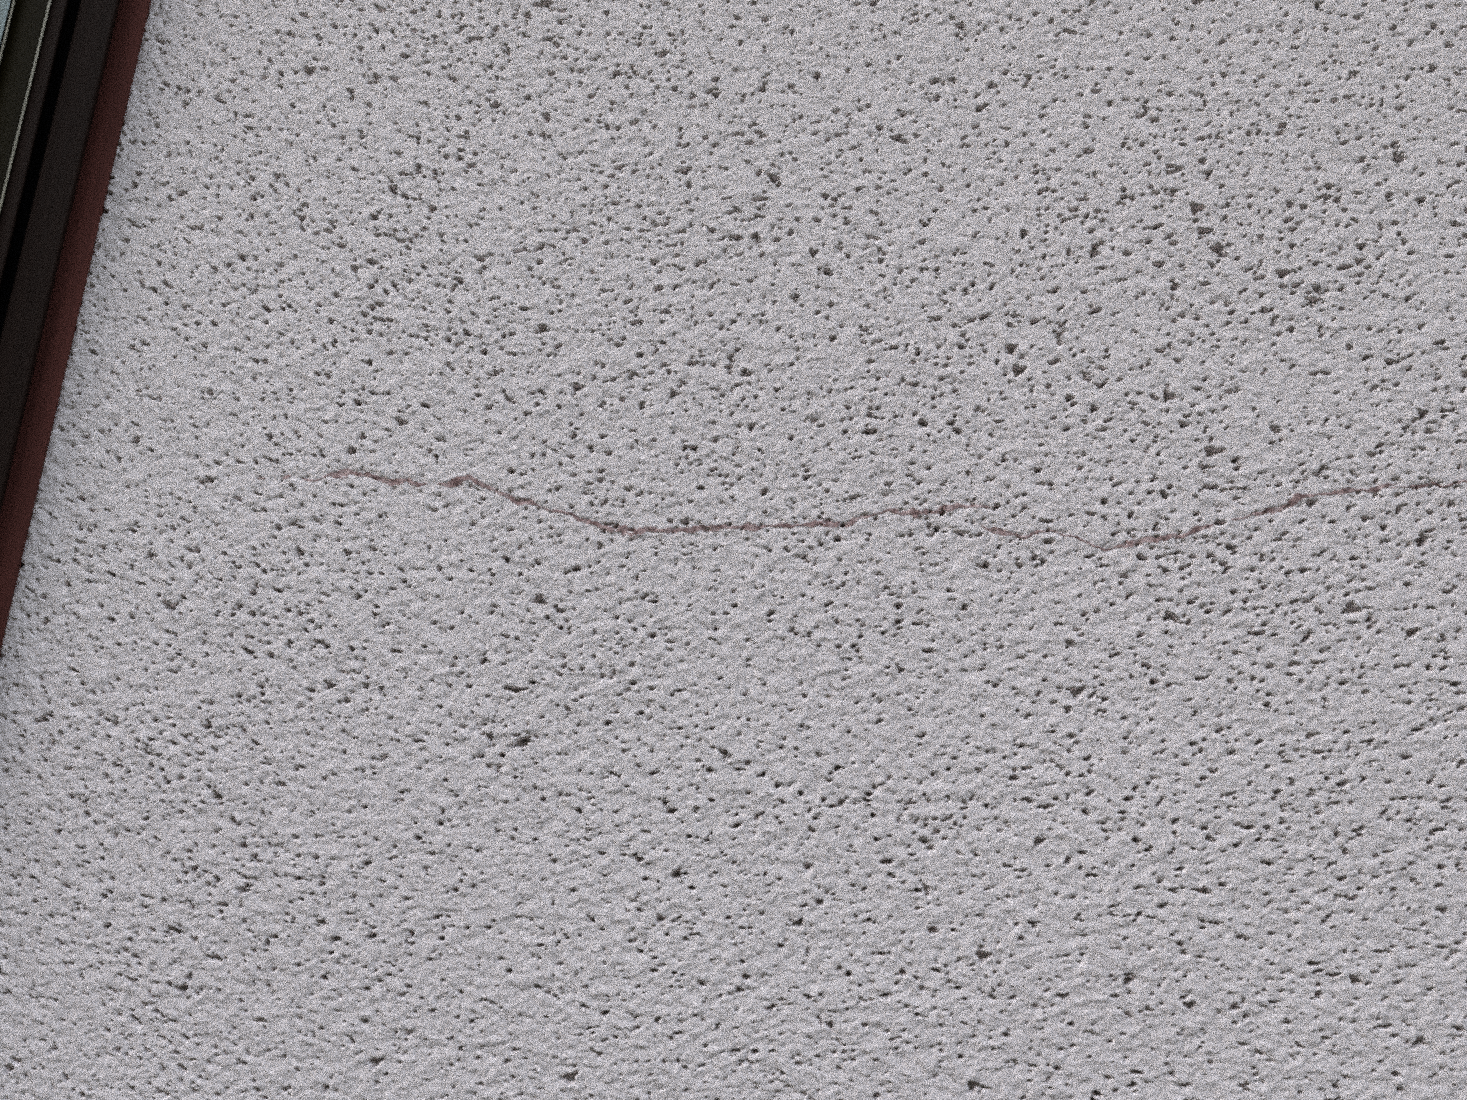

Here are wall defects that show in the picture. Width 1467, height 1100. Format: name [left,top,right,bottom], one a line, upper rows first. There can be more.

crack [257,468,1467,551]